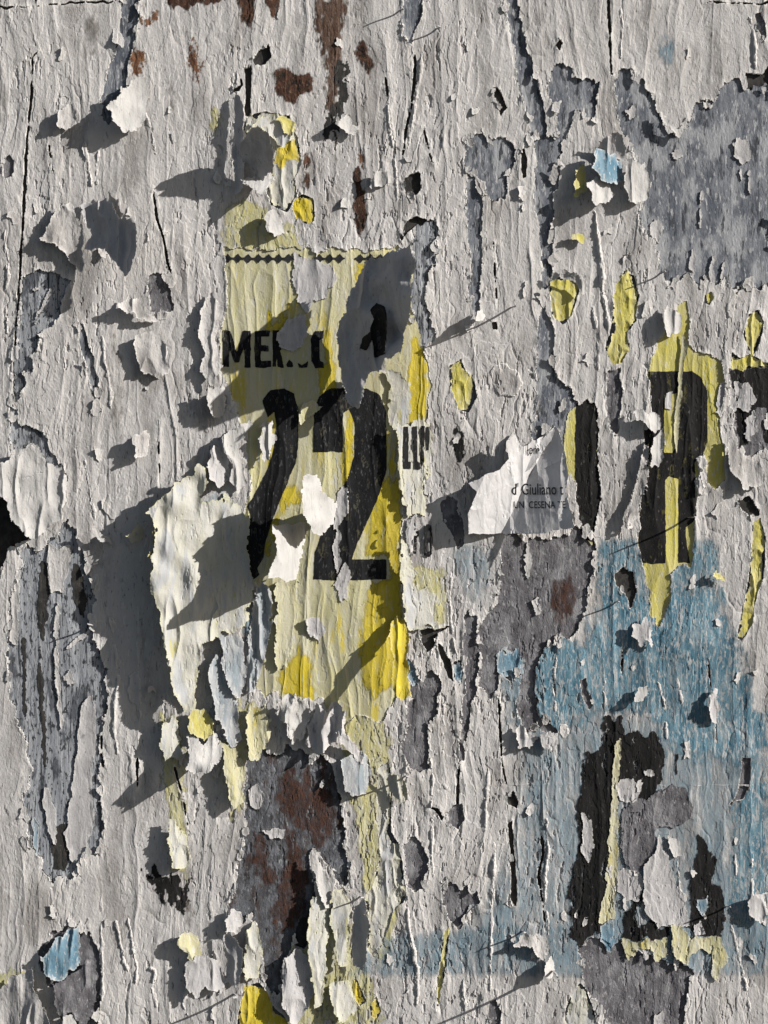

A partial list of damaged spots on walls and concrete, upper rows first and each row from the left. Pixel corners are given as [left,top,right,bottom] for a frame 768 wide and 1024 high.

crack [13,53,54,396]
peeling [56,104,77,130]
rust [273,0,374,145]
rust [352,154,368,237]
peeling [462,0,768,449]
peeling [0,191,155,882]
peeling [126,420,442,1024]
peeling [440,496,465,550]
peeling [455,524,598,762]
rust [250,765,333,933]